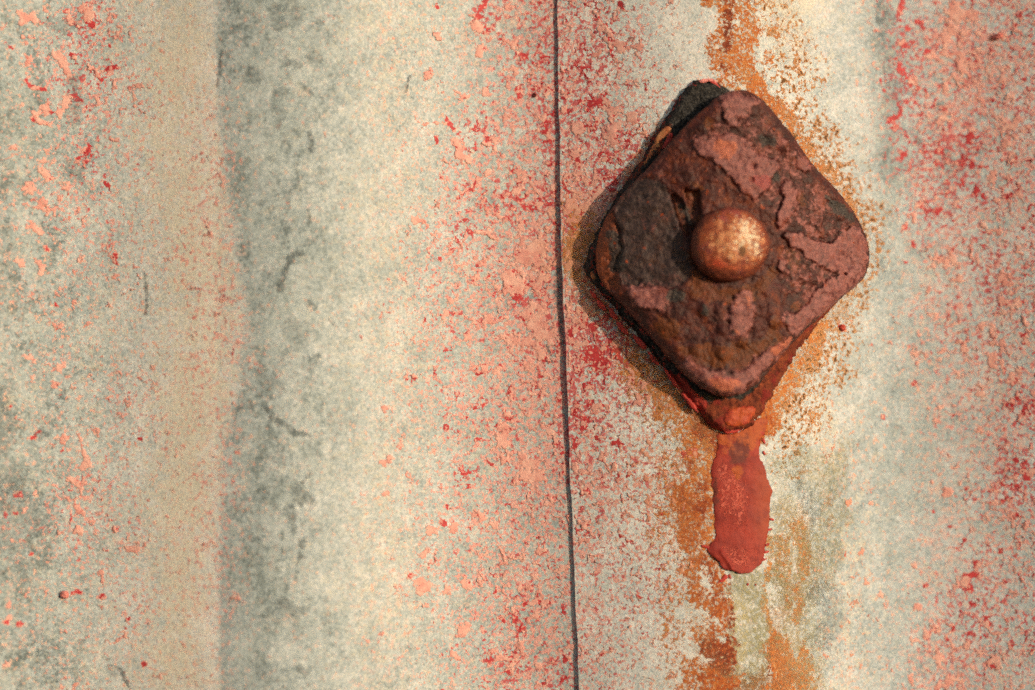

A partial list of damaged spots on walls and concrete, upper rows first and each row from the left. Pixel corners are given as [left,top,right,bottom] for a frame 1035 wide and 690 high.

peeling [0,0,165,276]
peeling [98,167,155,321]
peeling [0,271,266,419]
peeling [373,0,705,690]
rust [561,0,895,690]
peeling [855,0,1035,690]
peeling [0,580,91,653]
peeling [0,414,182,610]
peeling [104,597,168,682]
peeling [815,547,892,658]